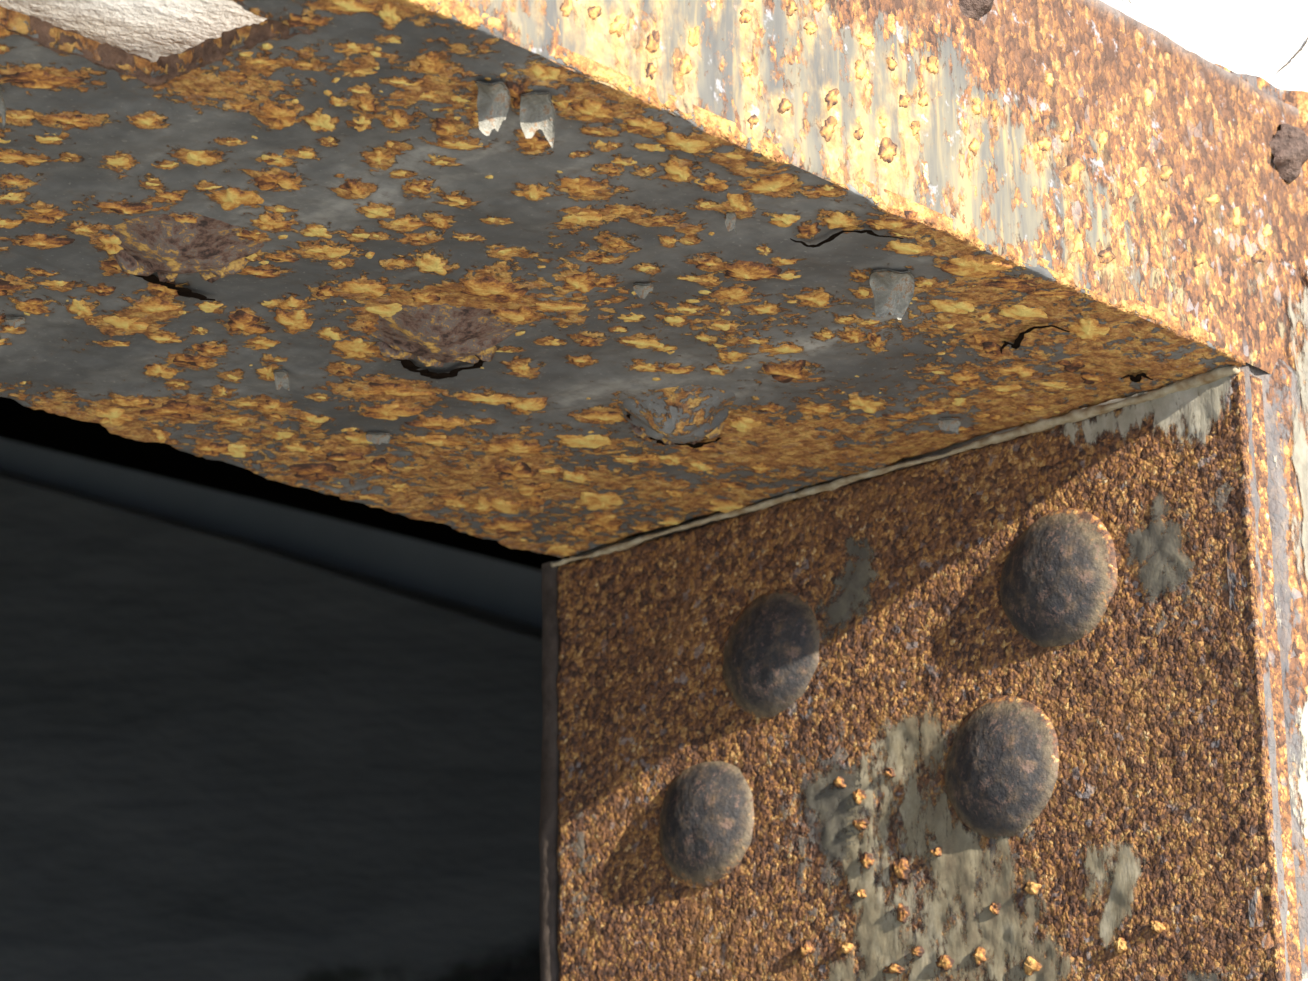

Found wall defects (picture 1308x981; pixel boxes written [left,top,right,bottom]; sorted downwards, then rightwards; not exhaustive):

corrosion [559,0,627,38]
corrosion [645,30,660,80]
corrosion [484,64,561,108]
corrosion [514,98,793,224]
corrosion [819,88,839,142]
corrosion [878,116,897,163]
corrosion [770,184,933,255]
corrosion [459,239,830,383]
corrosion [822,317,883,351]
corrosion [841,254,1110,432]
corrosion [457,393,548,414]
corrosion [556,398,747,513]